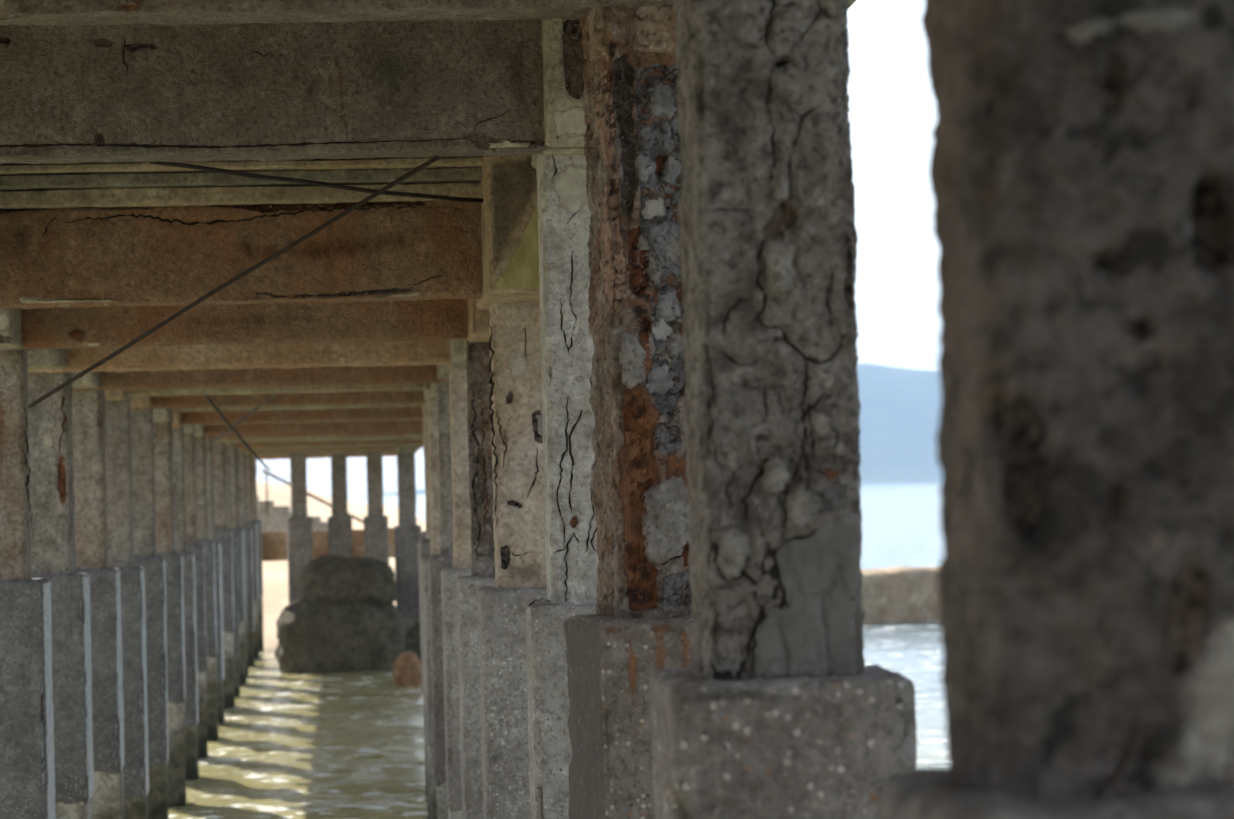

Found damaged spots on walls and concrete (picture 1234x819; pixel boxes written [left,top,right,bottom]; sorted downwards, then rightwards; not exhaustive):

crack [42,205,466,238]